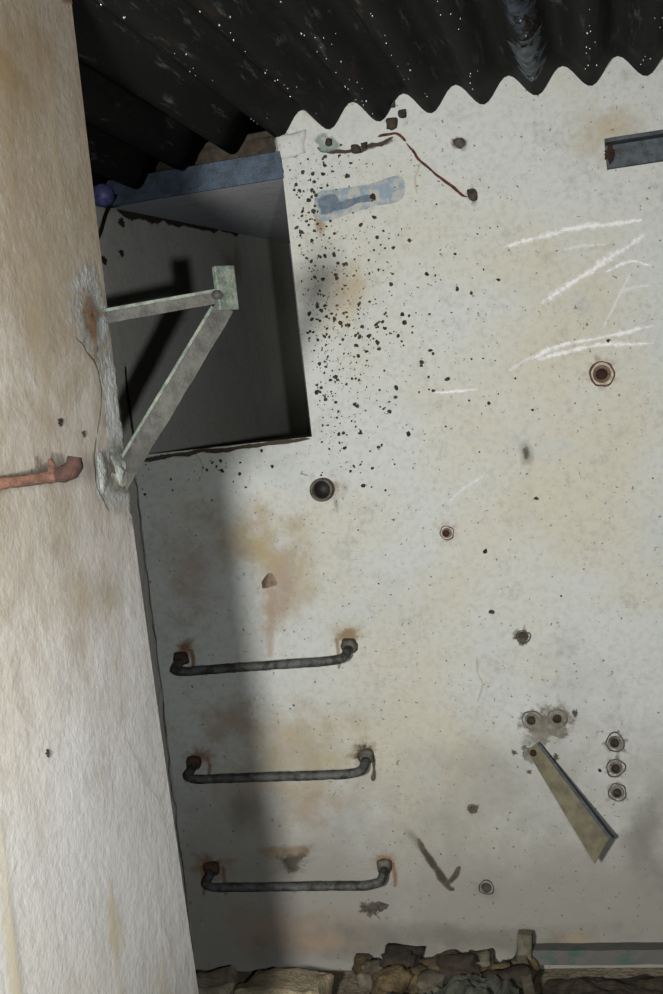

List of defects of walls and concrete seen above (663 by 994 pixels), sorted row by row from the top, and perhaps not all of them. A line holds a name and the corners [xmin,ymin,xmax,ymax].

water stain [289,144,435,462]